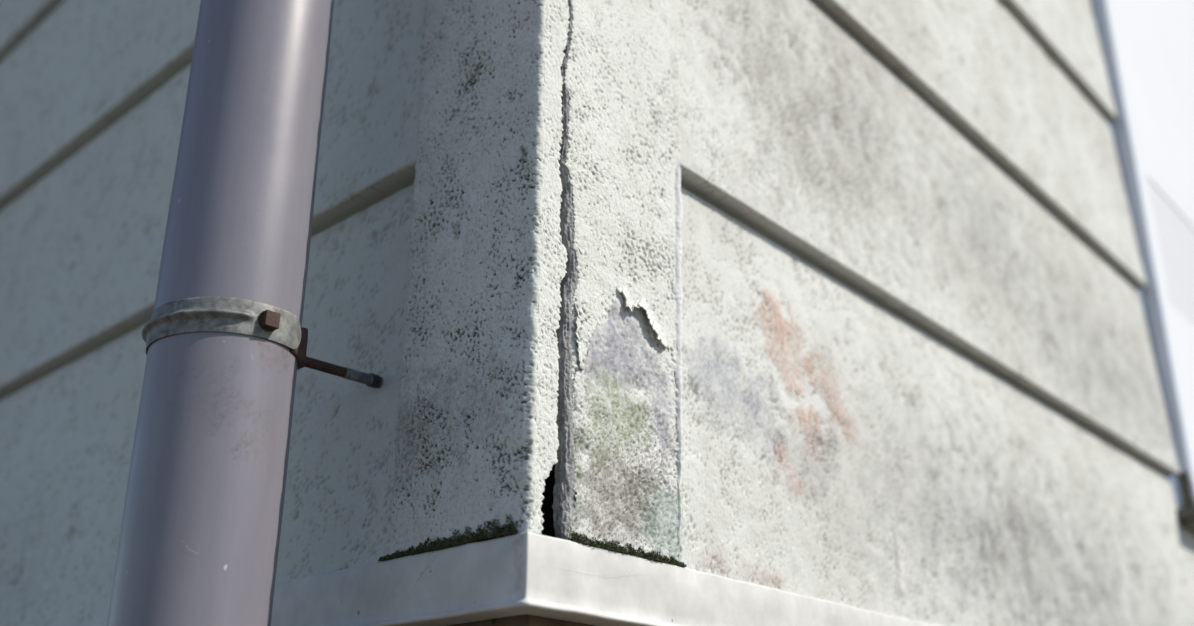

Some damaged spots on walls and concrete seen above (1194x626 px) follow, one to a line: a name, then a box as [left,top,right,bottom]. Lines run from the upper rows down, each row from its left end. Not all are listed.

crack [541,0,581,540]
peeling [569,287,682,561]